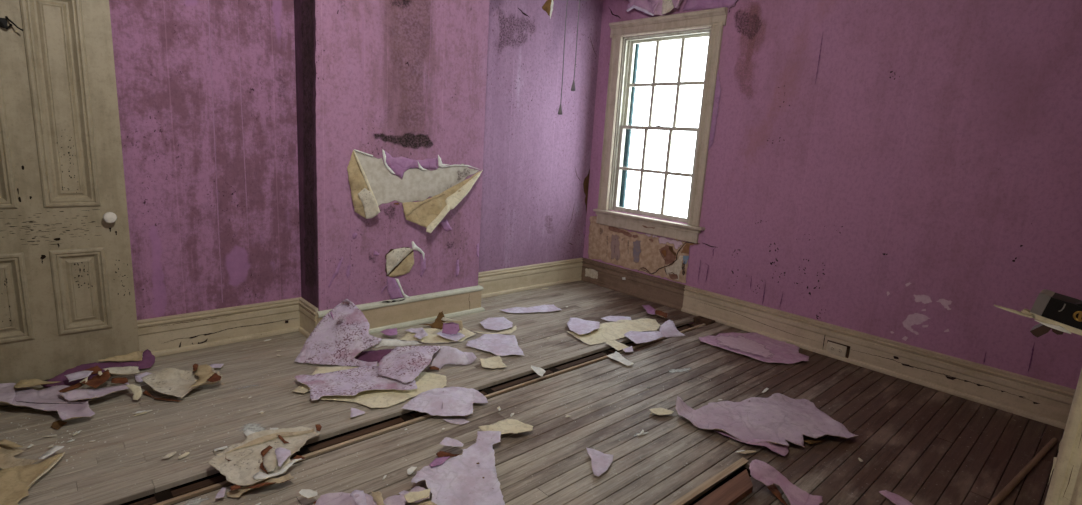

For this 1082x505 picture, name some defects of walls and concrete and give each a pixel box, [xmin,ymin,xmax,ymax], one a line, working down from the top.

water stain [273,0,318,292]
water stain [369,0,458,158]
flaking render [583,169,700,283]